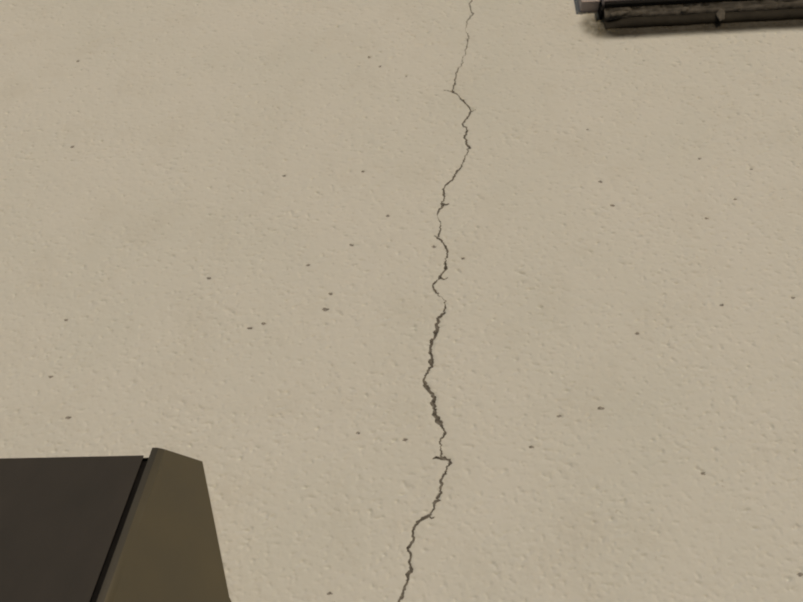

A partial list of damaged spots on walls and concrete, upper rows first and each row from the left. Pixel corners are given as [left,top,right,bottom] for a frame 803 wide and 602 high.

crack [398,0,474,602]